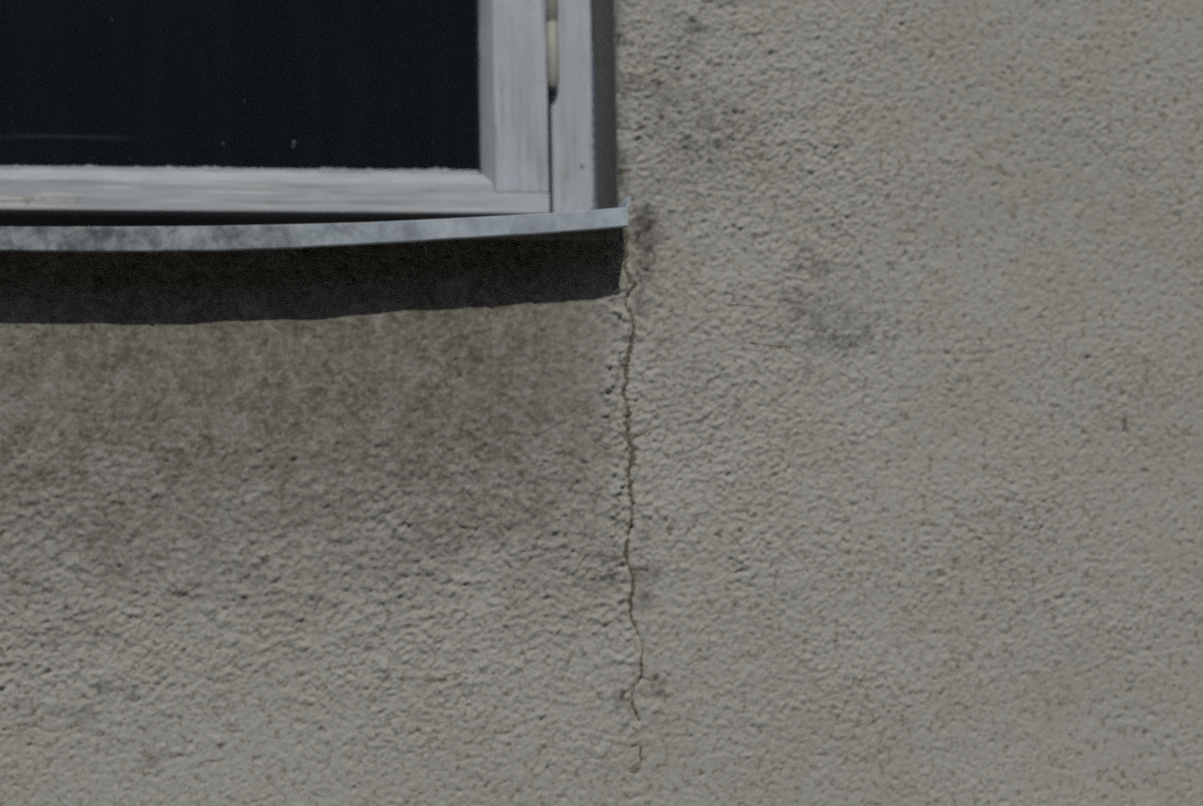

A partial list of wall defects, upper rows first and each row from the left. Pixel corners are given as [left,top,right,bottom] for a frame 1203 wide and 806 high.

crack [595,229,657,773]